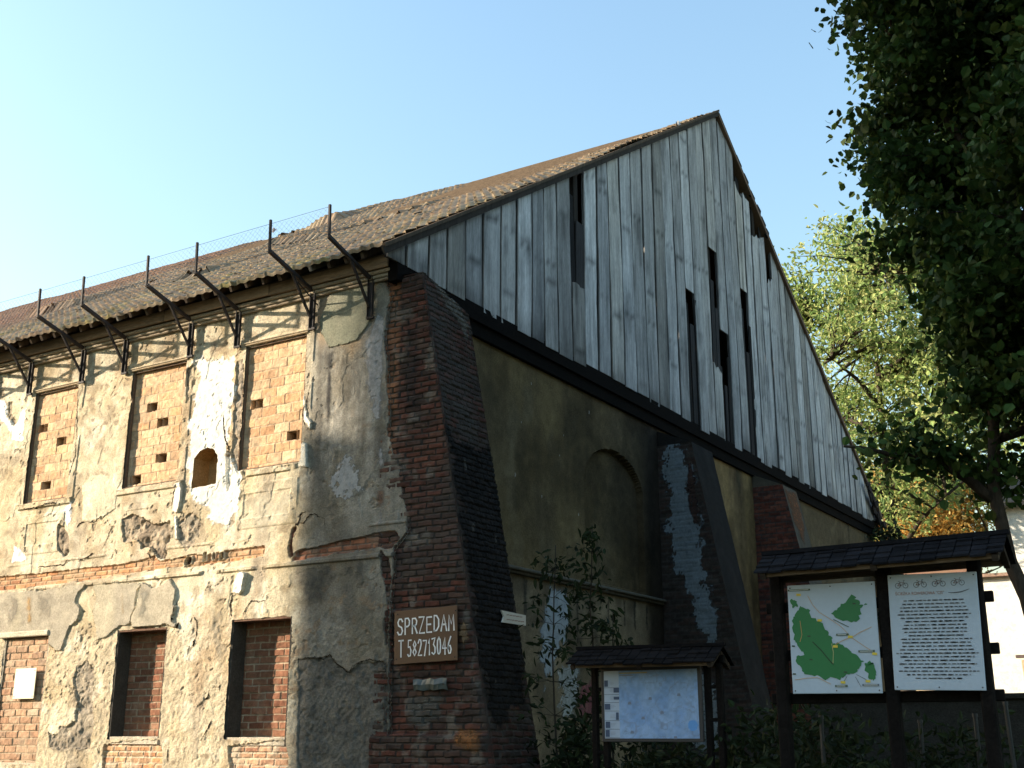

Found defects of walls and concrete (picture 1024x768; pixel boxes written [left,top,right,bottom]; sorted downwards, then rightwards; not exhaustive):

flaking render [185,364,198,405]
flaking render [225,358,244,470]
peeling [328,454,363,501]
flaking render [0,482,265,652]
flaking render [291,530,400,646]
peeling [661,443,719,643]
flaking render [47,660,163,768]
crack [294,654,383,673]